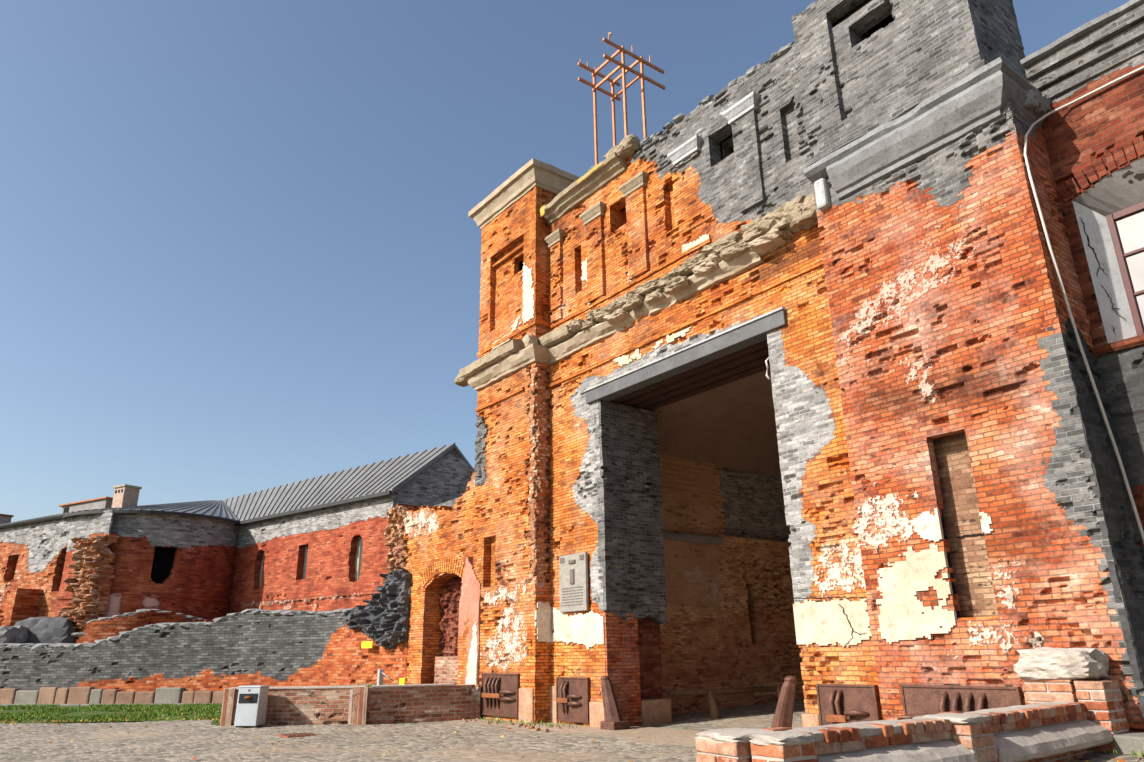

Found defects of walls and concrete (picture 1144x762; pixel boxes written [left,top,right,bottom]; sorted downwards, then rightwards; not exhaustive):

spalling [588,42,795,172]
spalling [814,178,831,211]
crack [1079,217,1126,335]
spalling [57,535,121,629]
spalling [338,505,440,649]
spalling [466,365,605,684]
peeling [741,482,1044,688]